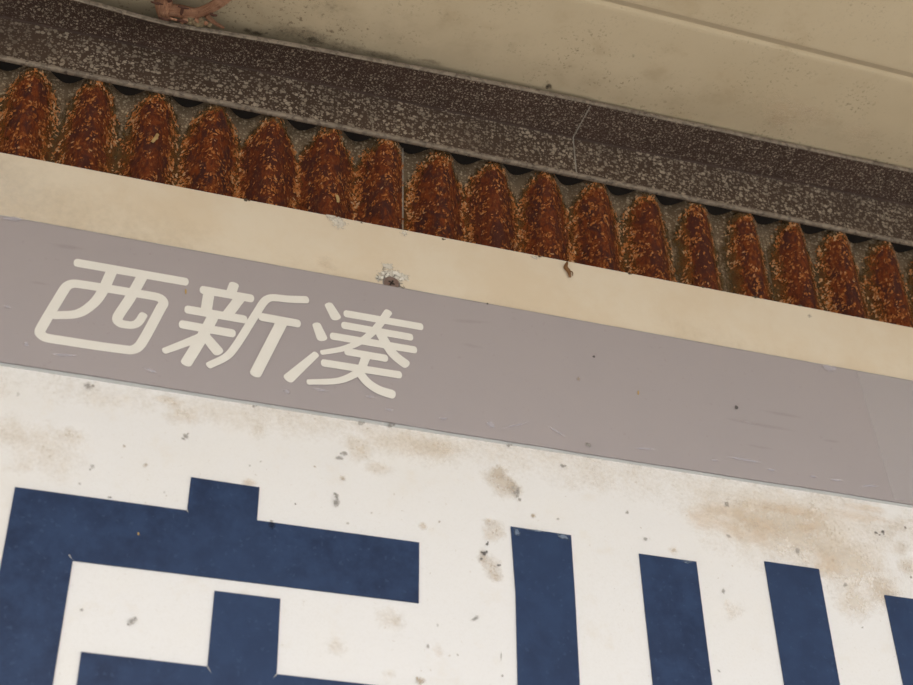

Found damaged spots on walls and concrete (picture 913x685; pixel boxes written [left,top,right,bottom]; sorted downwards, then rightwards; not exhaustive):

corrosion [0,68,913,328]